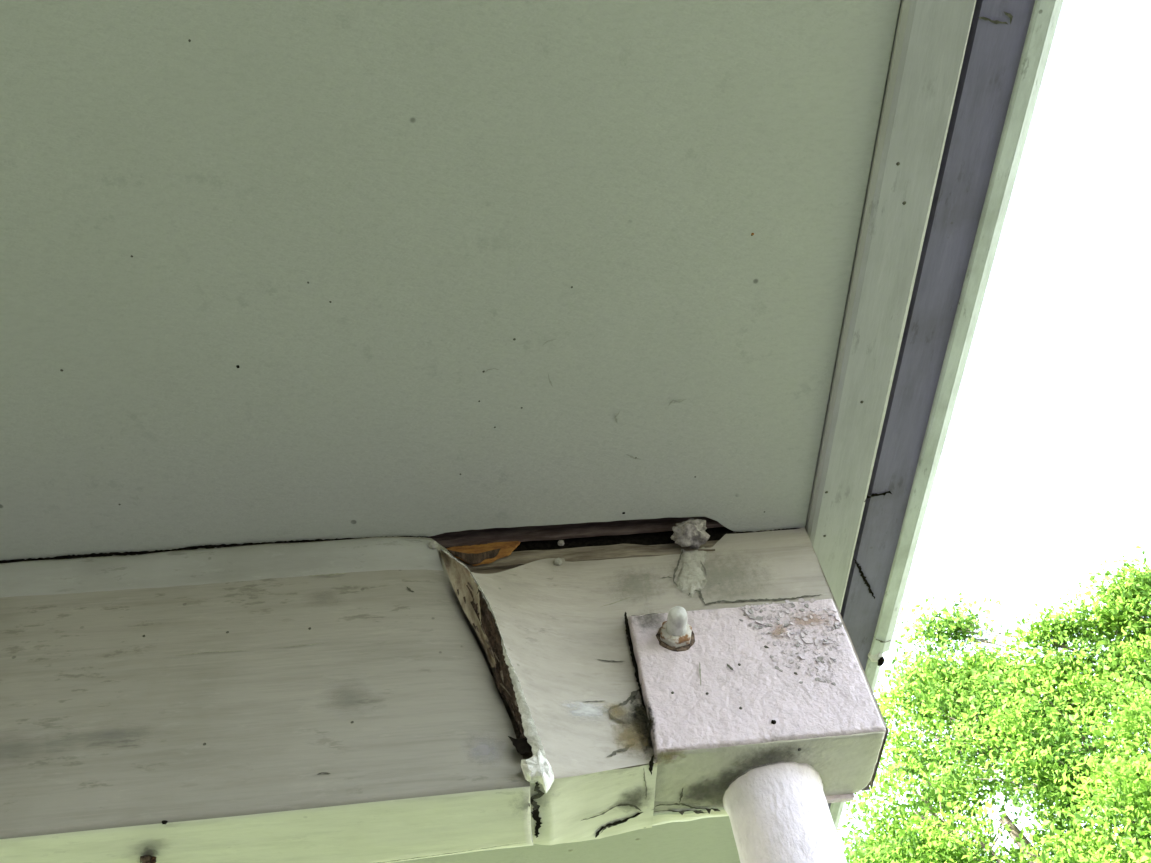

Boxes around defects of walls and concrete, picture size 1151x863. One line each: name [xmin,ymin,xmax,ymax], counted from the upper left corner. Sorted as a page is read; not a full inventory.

crack [0,536,428,563]
peeling [739,598,844,685]
leakage [624,695,655,751]
crack [583,597,720,838]
leakage [687,748,794,803]